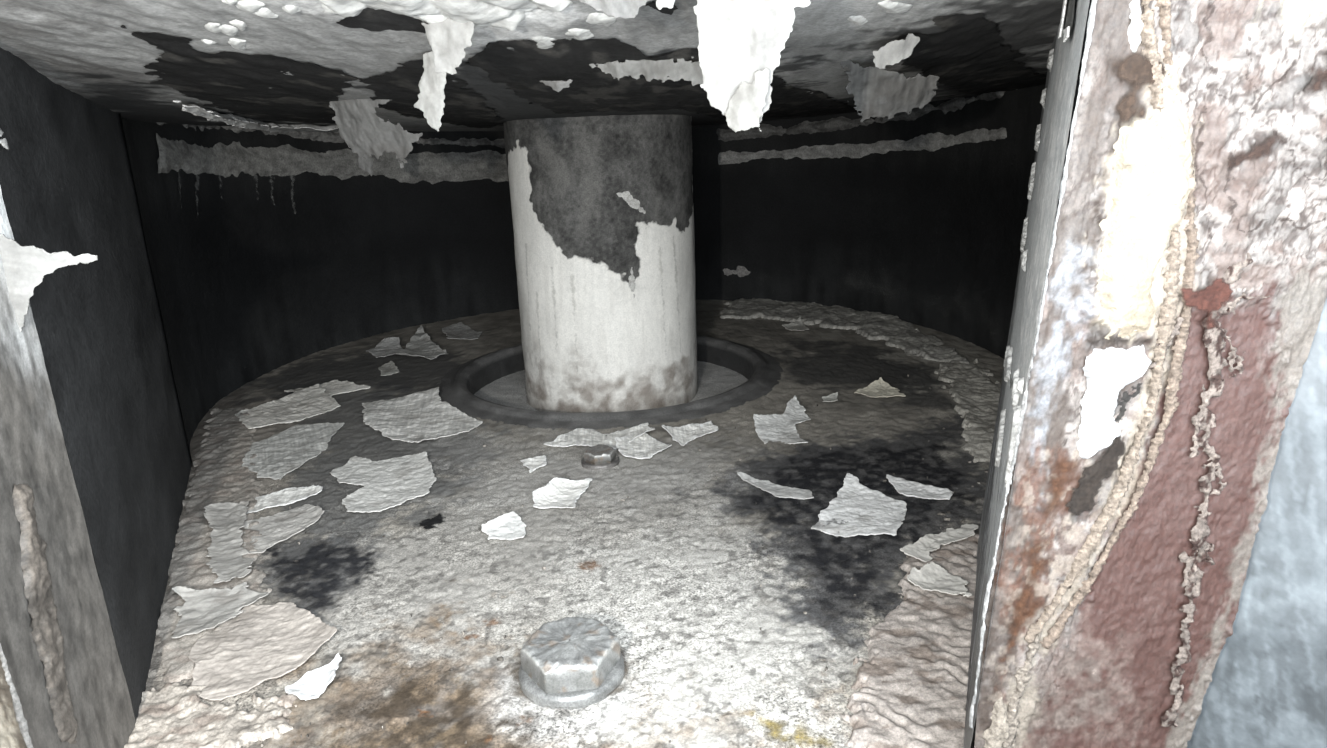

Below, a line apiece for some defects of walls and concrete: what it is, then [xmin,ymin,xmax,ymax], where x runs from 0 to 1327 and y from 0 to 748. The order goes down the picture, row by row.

peeling [120,0,1075,298]
peeling [0,234,98,332]
peeling [124,322,483,748]
peeling [481,511,526,540]
peeling [520,421,718,509]
peeling [720,298,1025,488]
peeling [886,474,954,500]
rust [1044,461,1078,515]
spalling [1065,344,1151,516]
rust [1000,546,1047,662]